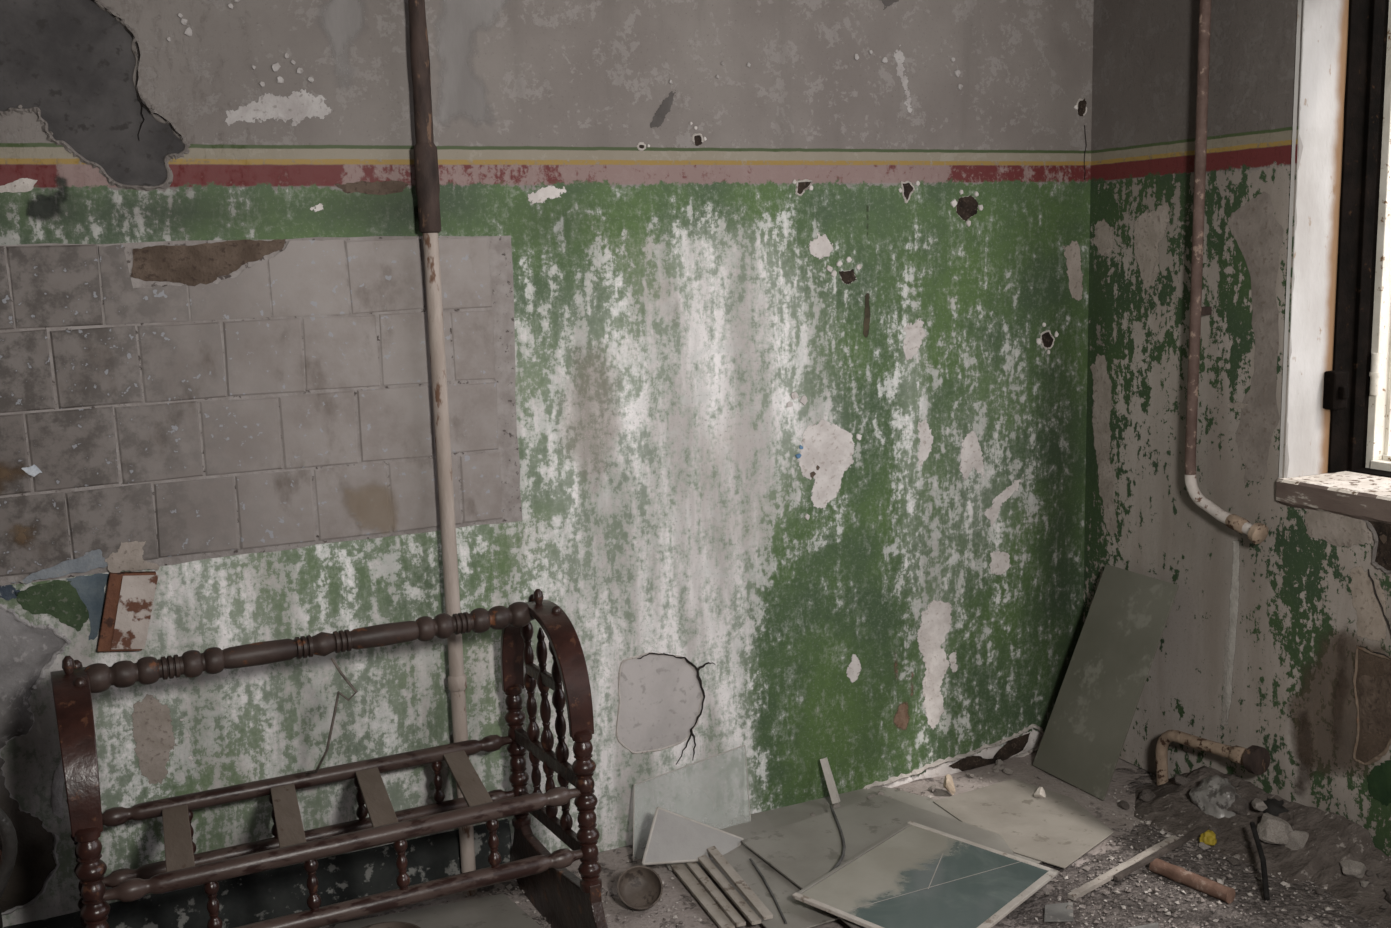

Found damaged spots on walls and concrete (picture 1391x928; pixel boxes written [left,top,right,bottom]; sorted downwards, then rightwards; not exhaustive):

spalling [0,0,192,193]
peeling [223,53,333,126]
peeling [528,185,566,204]
spalling [131,239,286,286]
peeling [808,233,861,284]
peeling [795,419,862,520]
peeling [1090,354,1118,535]
peeling [0,541,160,640]
peeling [1304,509,1391,641]
crack [1360,569,1391,660]
crack [637,653,715,765]
spalling [863,724,1044,789]